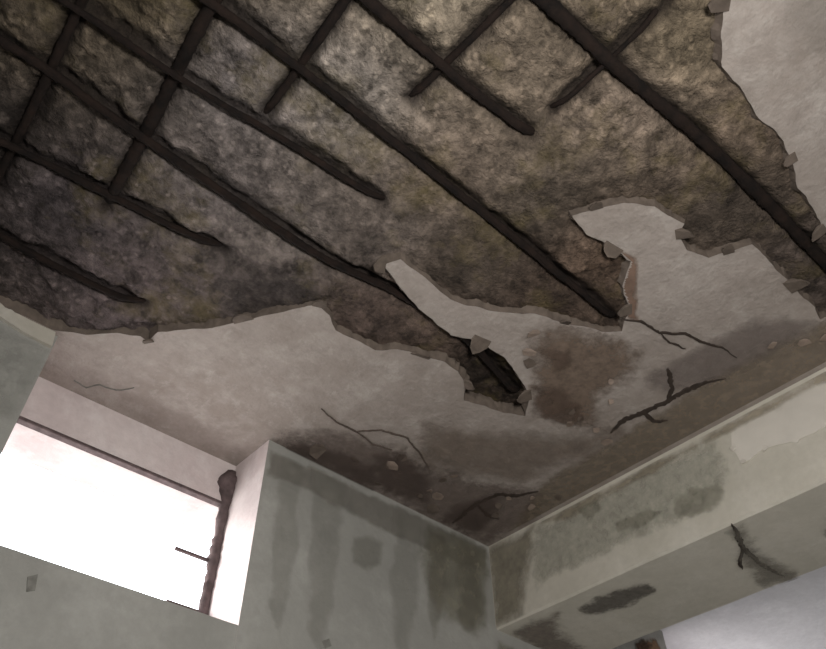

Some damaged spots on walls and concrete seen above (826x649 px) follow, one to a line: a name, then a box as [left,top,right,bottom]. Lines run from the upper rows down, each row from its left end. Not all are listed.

spalling [0,0,826,433]
crack [622,318,737,358]
crack [610,368,727,433]
crack [321,408,431,473]
leakage [286,325,826,627]
crack [731,524,754,570]